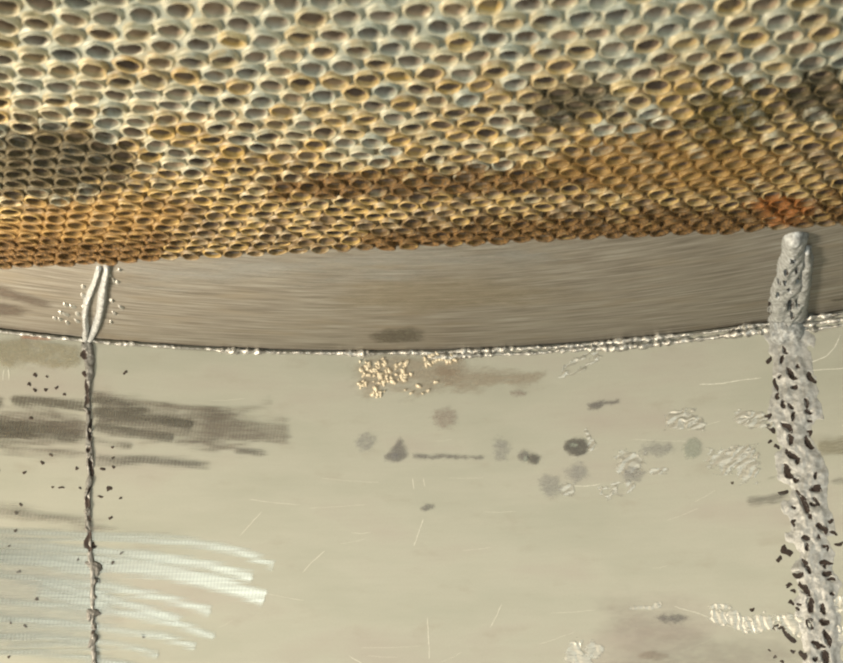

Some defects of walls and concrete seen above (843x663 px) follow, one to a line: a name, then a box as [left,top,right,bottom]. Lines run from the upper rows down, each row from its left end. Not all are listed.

water stain [526,78,616,131]
water stain [0,116,140,203]
rust [339,186,843,252]
water stain [376,330,418,342]